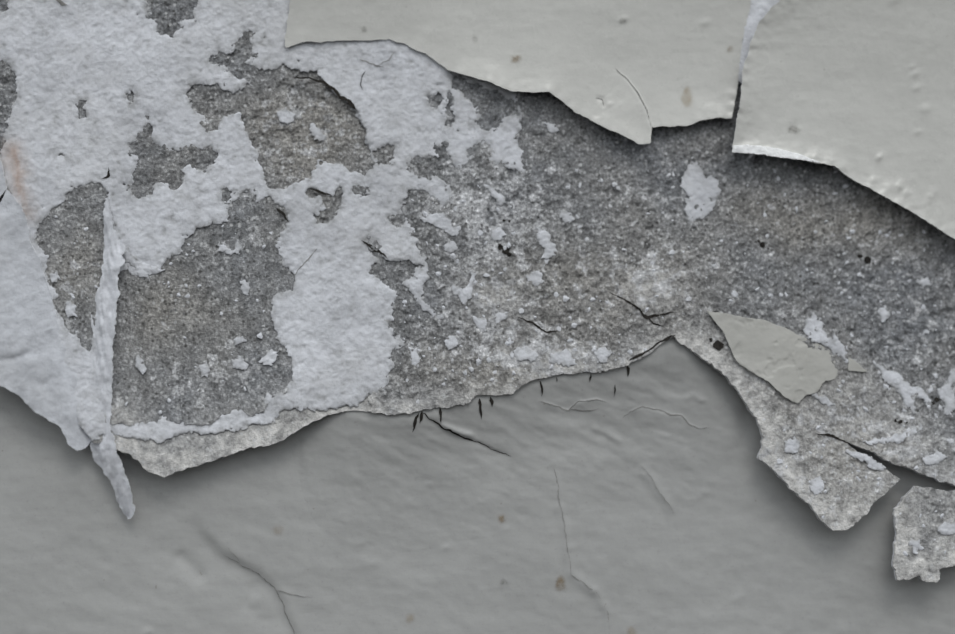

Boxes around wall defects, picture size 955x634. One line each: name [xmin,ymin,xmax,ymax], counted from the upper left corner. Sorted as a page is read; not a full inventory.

spalling [145,0,198,38]
spalling [0,31,395,519]
spalling [284,0,955,583]
crack [223,548,308,634]